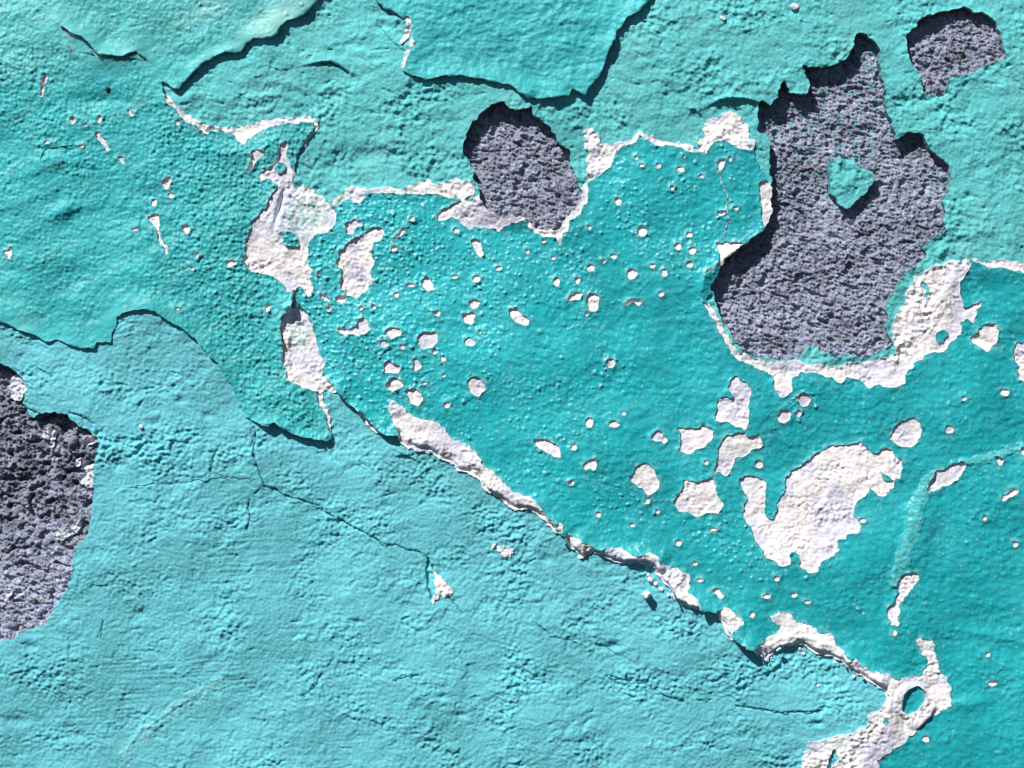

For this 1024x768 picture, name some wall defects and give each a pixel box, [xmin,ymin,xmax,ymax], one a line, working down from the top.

spalling [906,8,1004,97]
peeling [0,0,337,441]
spalling [0,363,99,641]
crack [127,438,461,611]
peeling [243,35,1024,768]